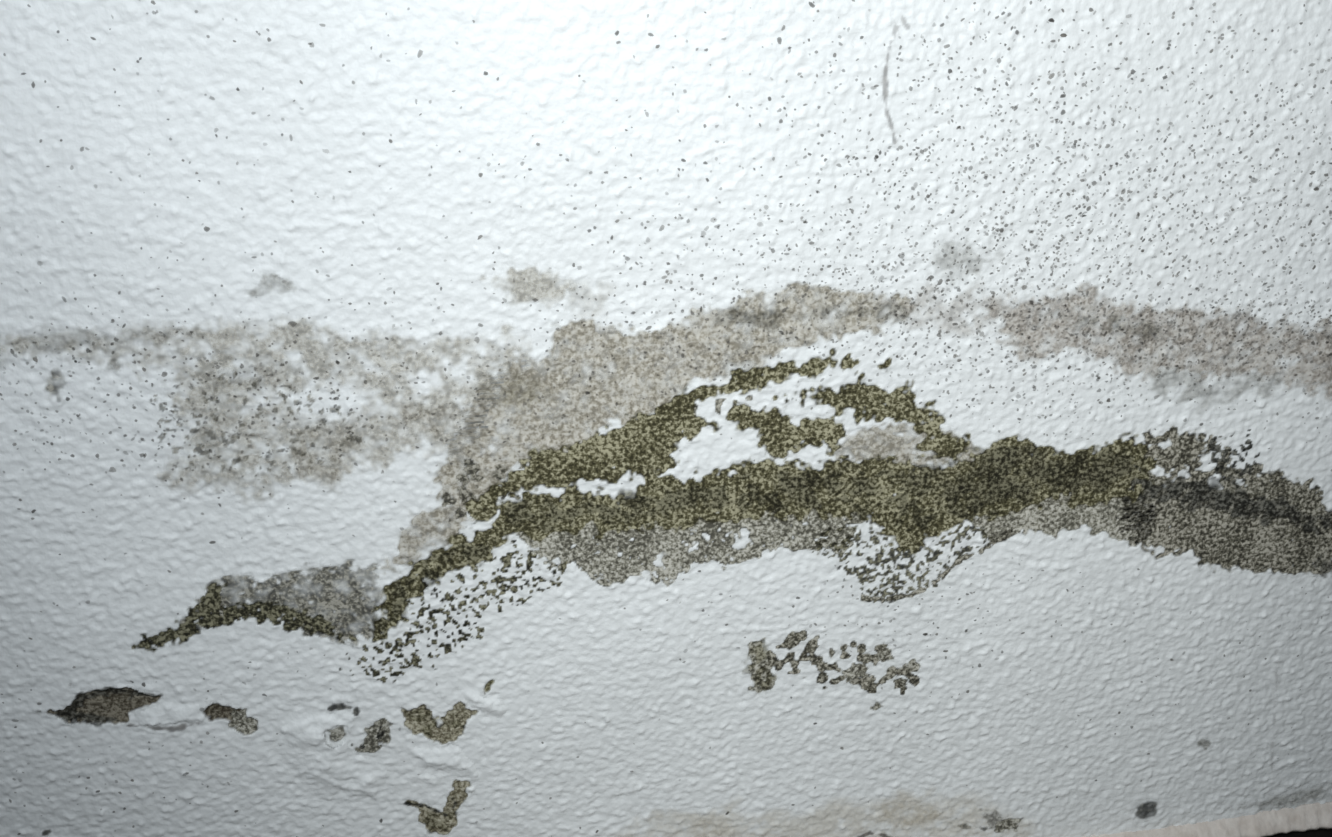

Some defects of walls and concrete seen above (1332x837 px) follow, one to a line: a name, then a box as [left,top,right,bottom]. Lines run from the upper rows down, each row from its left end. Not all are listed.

damp [129,71,1332,683]
peeling [47,687,160,725]
peeling [203,704,258,735]
peeling [328,702,477,753]
peeling [404,780,470,835]